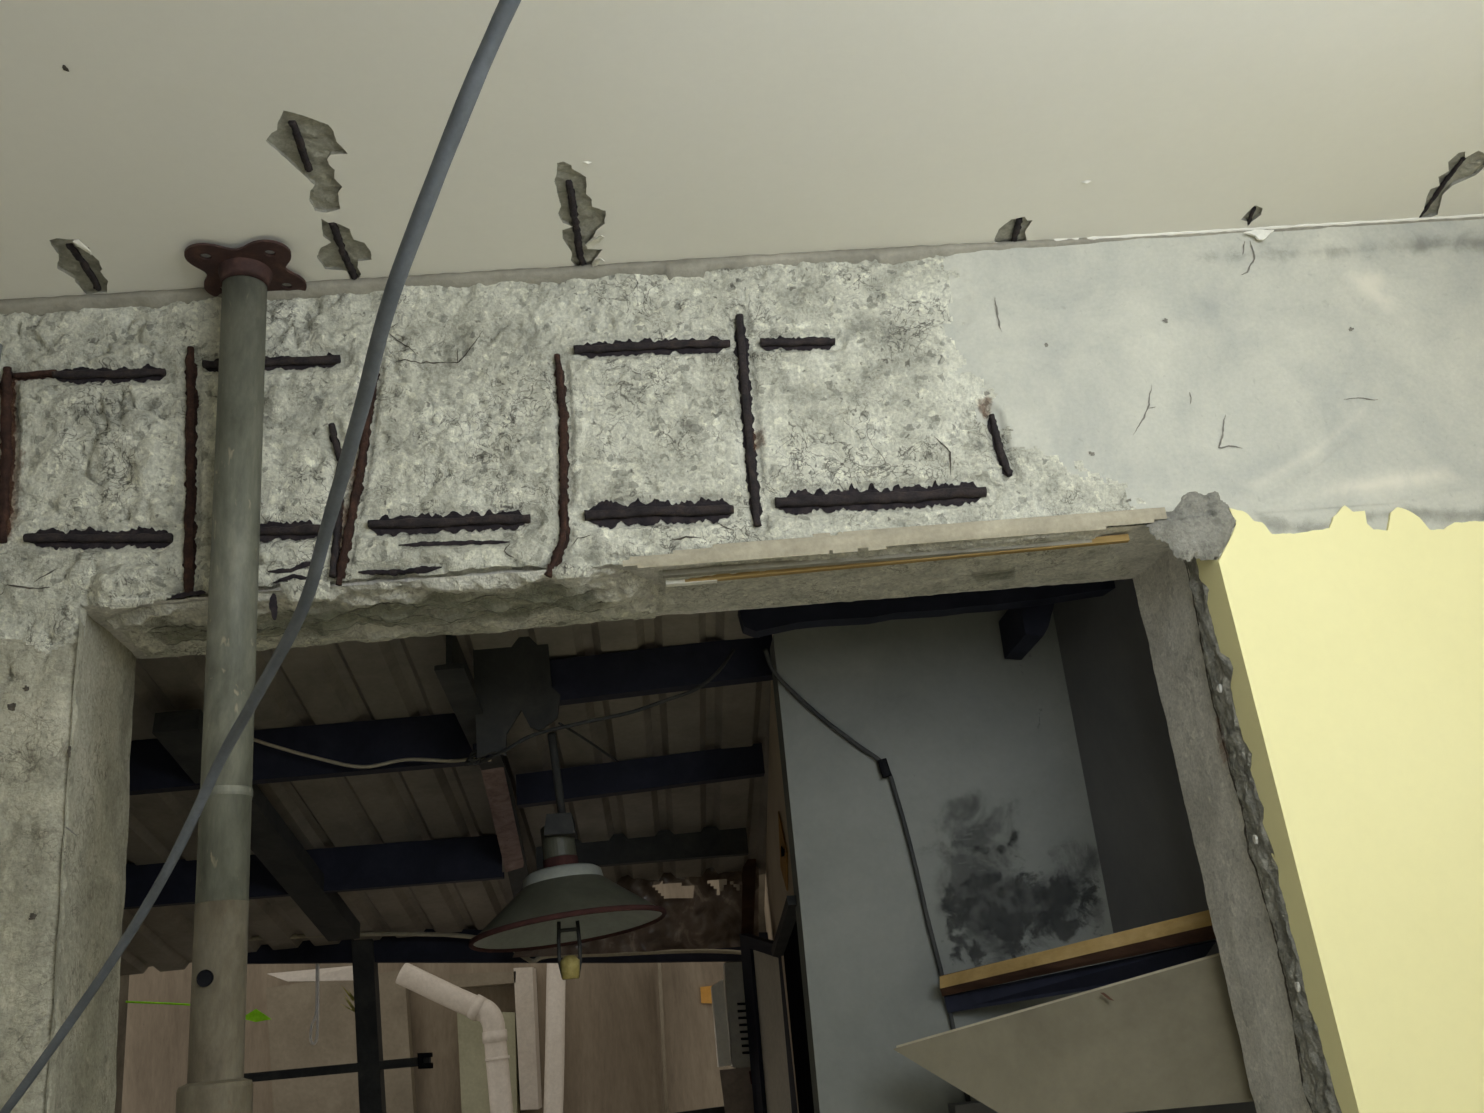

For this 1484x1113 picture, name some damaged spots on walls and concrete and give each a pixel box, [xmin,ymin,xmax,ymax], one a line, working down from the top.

crack [0,568,58,595]
spalling [0,238,222,1113]
spalling [256,111,1484,651]
mould [942,798,1098,964]
flaking render [1184,557,1342,1113]